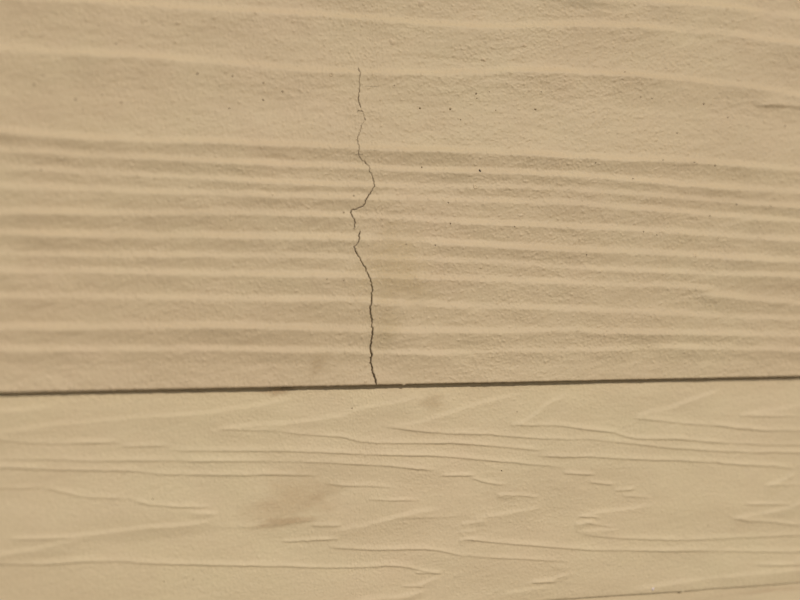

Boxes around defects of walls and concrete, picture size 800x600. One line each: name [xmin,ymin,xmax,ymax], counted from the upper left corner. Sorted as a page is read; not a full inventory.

crack [350,68,377,385]